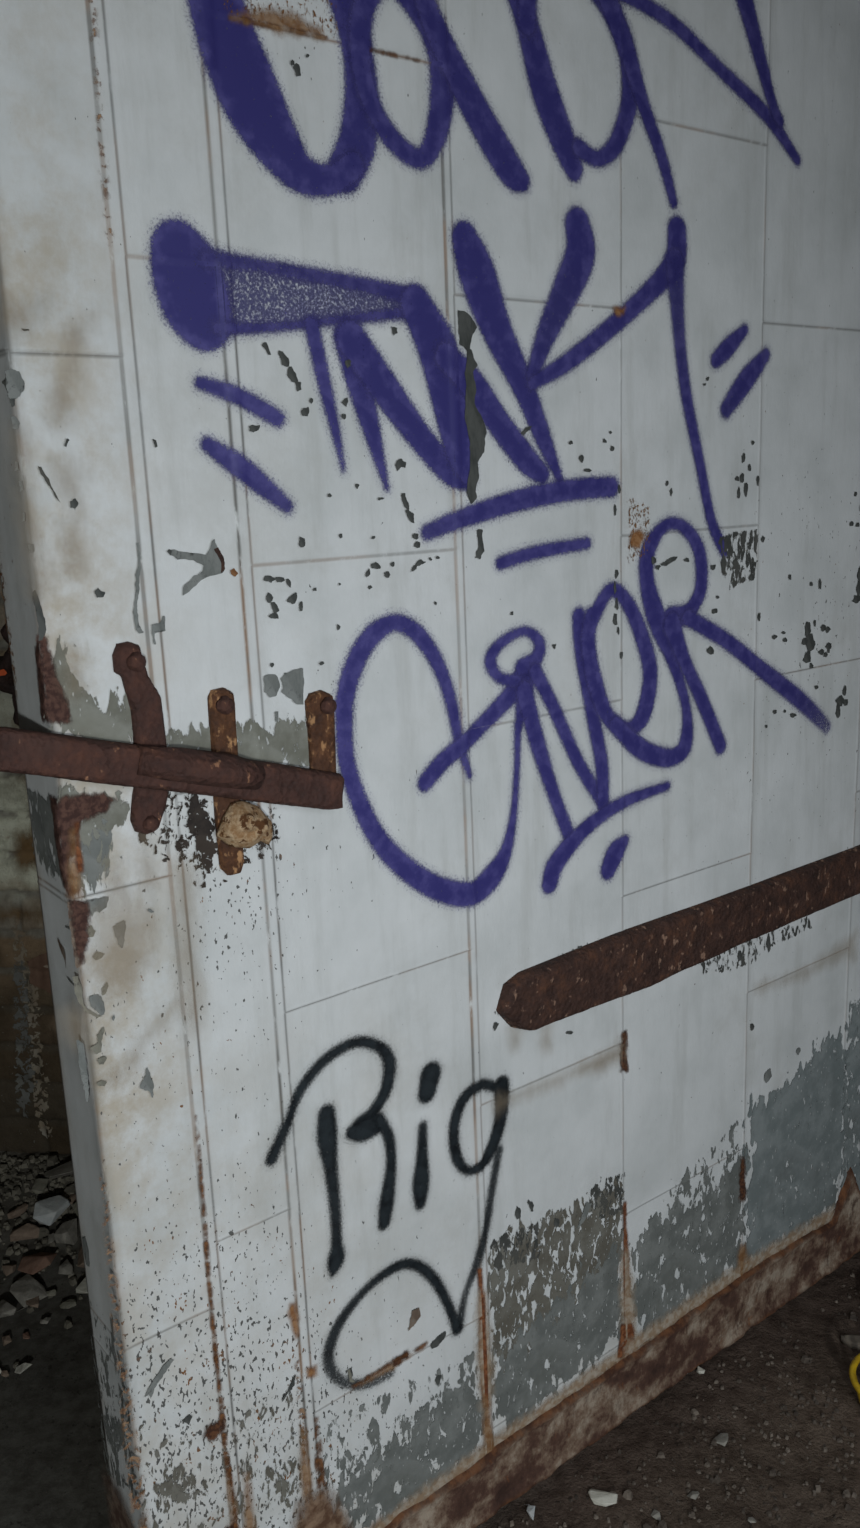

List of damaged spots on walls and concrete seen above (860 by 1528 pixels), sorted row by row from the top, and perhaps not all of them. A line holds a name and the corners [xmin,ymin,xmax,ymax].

rust [35,634,71,724]
rust [49,793,113,964]
peeling [701,917,812,974]
rust [197,1138,254,1528]
rust [289,1304,298,1338]
rust [295,1360,351,1528]
rust [353,1343,426,1388]
peeling [90,999,860,1528]
rust [375,1202,833,1528]